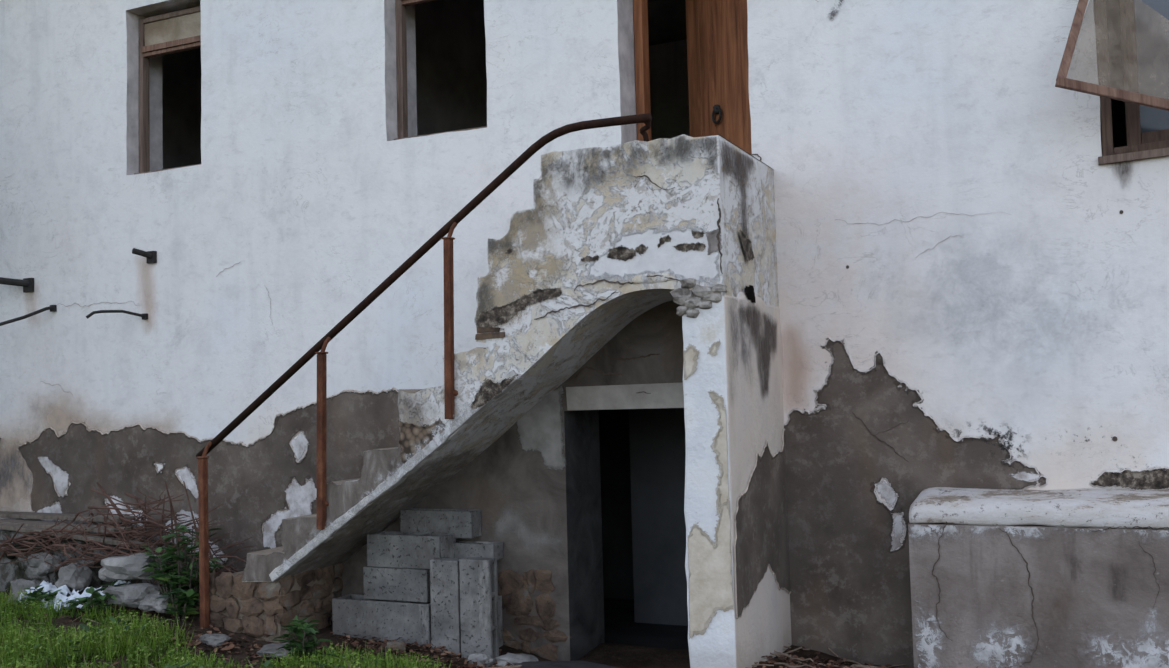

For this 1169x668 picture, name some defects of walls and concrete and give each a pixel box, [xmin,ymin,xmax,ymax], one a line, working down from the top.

spalling [581,229,722,262]
spalling [477,288,562,327]
spalling [670,278,727,318]
spalling [744,285,756,303]
water stain [733,306,777,395]
peeling [18,387,402,581]
peeling [683,337,1057,668]
spalling [1089,466,1169,490]
crack [932,522,952,641]
crack [998,528,1039,668]
crack [1074,526,1169,608]
peeling [1091,611,1169,668]